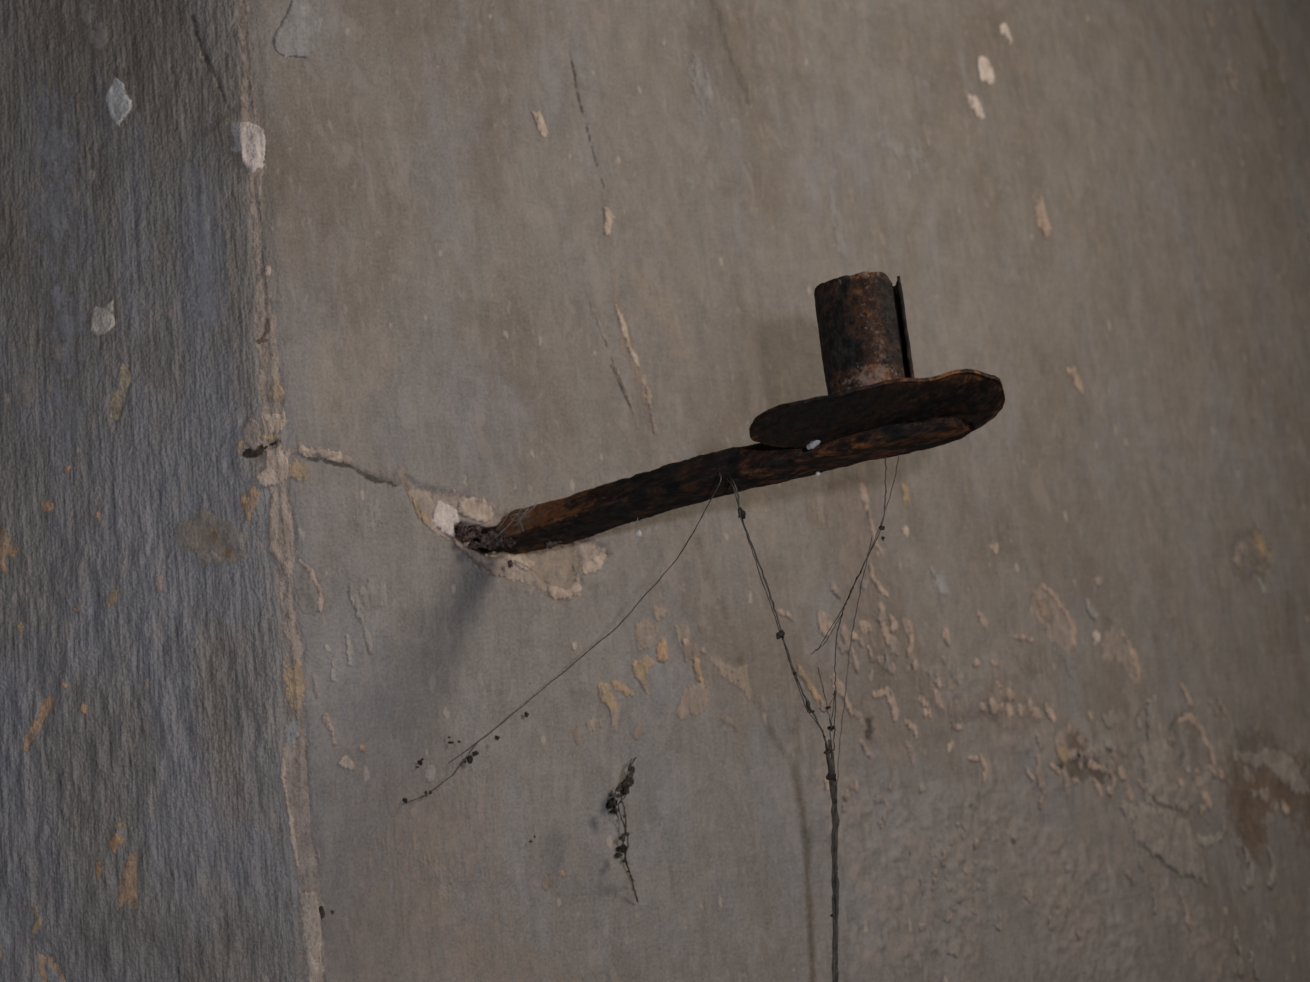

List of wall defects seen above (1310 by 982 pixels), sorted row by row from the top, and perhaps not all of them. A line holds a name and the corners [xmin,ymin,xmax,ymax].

spalling [105,77,132,127]
peeling [0,529,38,573]
spalling [230,0,387,982]
spalling [401,474,607,602]
peeling [23,683,67,752]
peeling [570,606,755,743]
peeling [796,469,980,773]
peeling [1029,581,1077,681]
peeling [1026,598,1226,885]
peeling [95,821,139,909]
peeling [38,954,66,982]